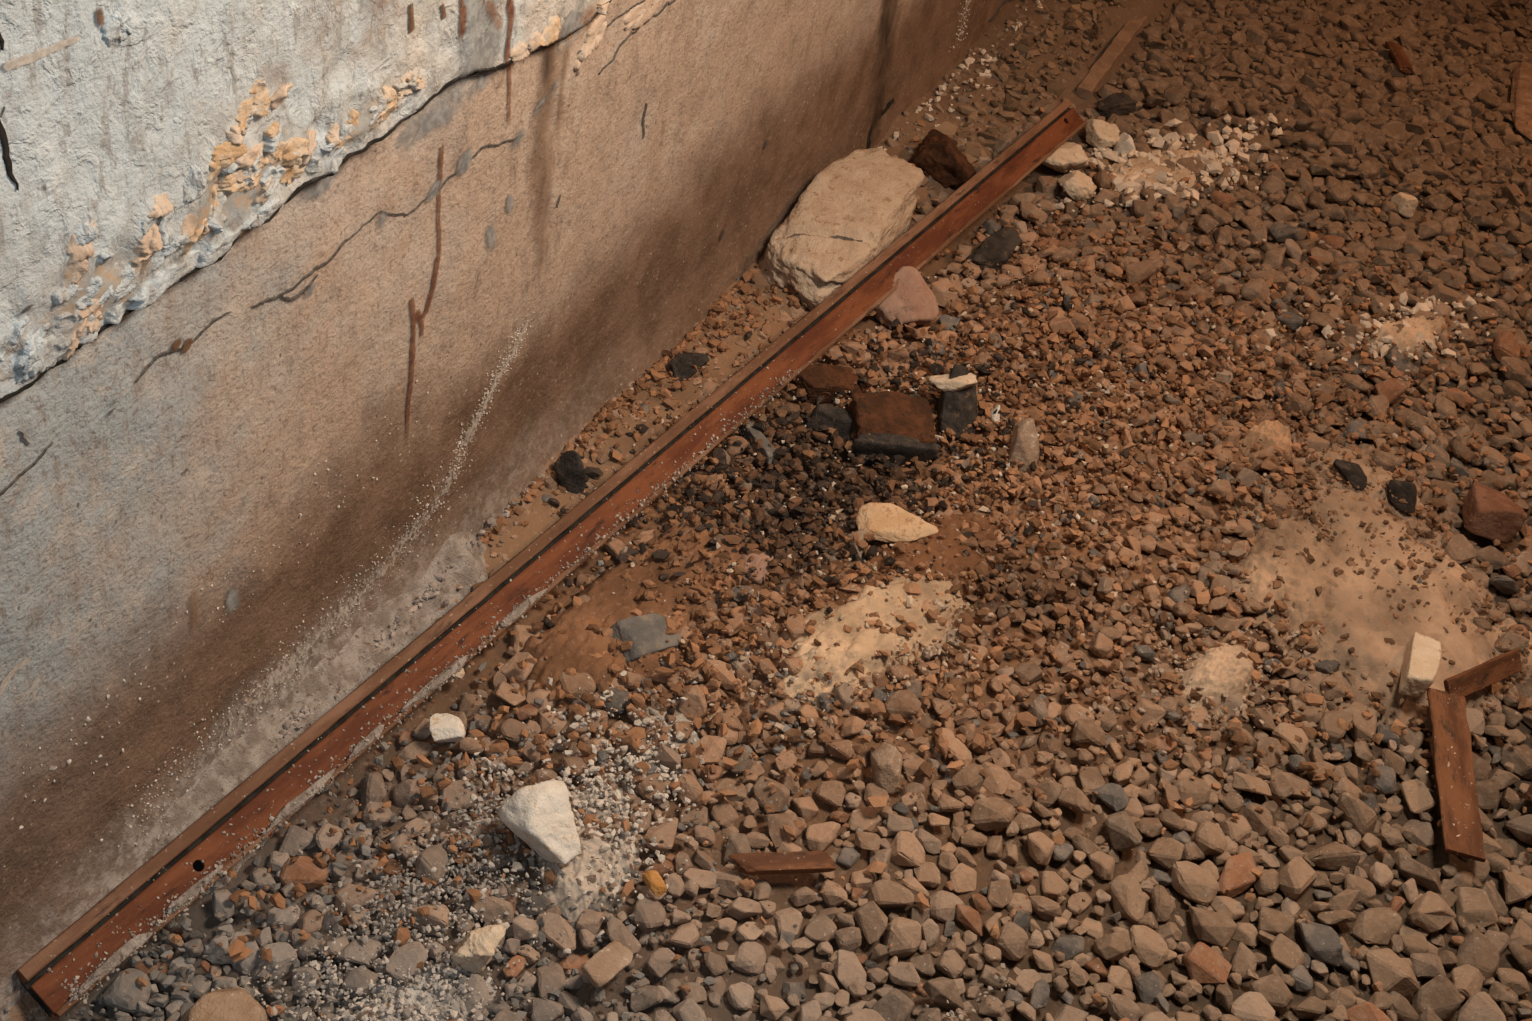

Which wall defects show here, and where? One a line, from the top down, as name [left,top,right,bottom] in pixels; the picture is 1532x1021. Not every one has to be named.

crack [0,33,8,51]
crack [0,106,19,191]
crack [0,310,134,496]
spalling [0,67,428,384]
crack [135,135,524,383]
crack [141,0,676,290]
rust [407,145,444,437]
rust [441,0,515,121]
water stain [100,306,535,851]
water stain [23,717,129,802]